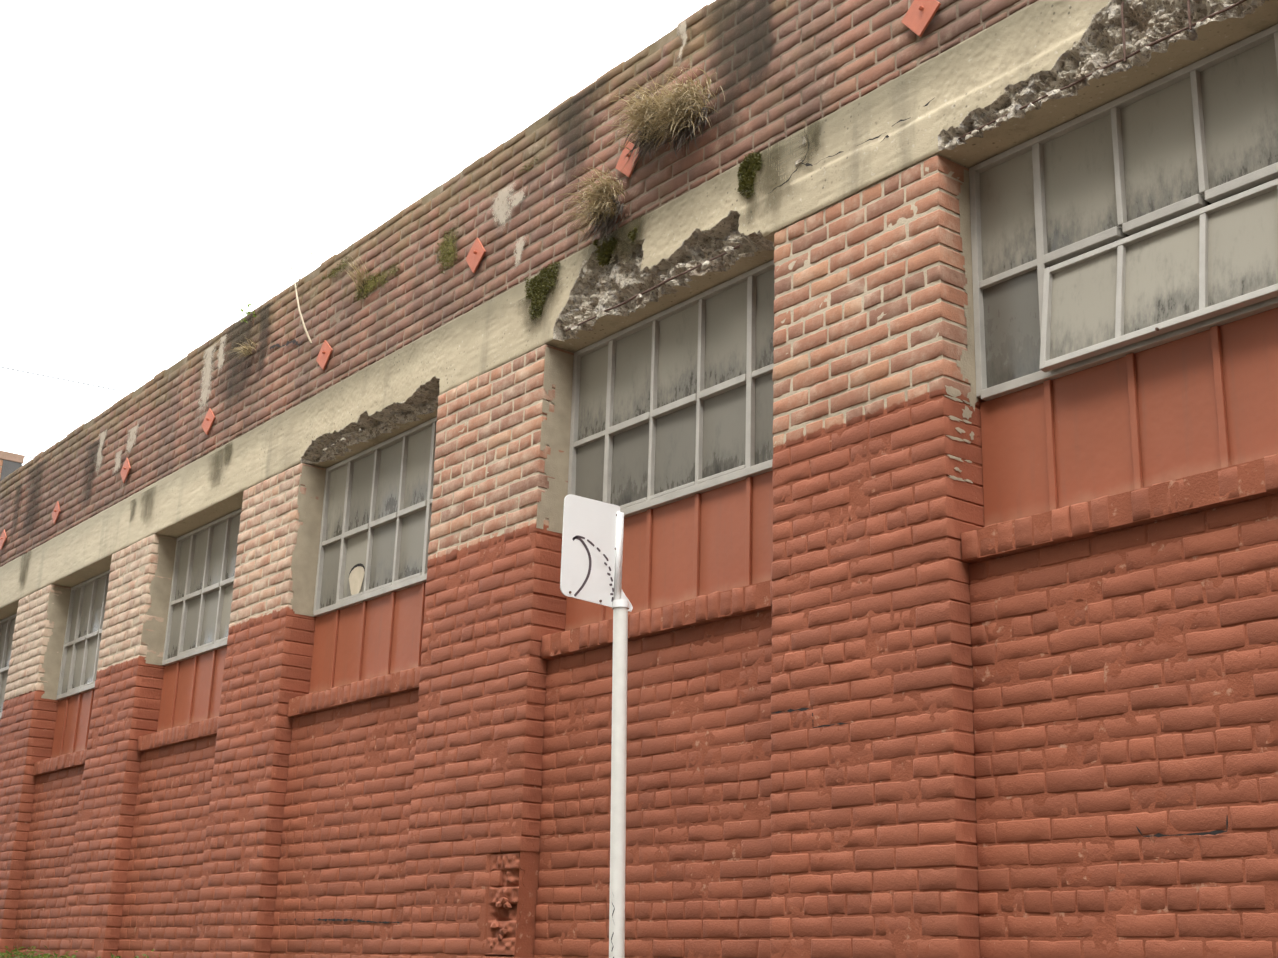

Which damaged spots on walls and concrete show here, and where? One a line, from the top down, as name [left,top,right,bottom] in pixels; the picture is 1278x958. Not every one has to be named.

spalling [938,0,1269,151]
spalling [553,210,775,341]
spalling [300,376,440,465]